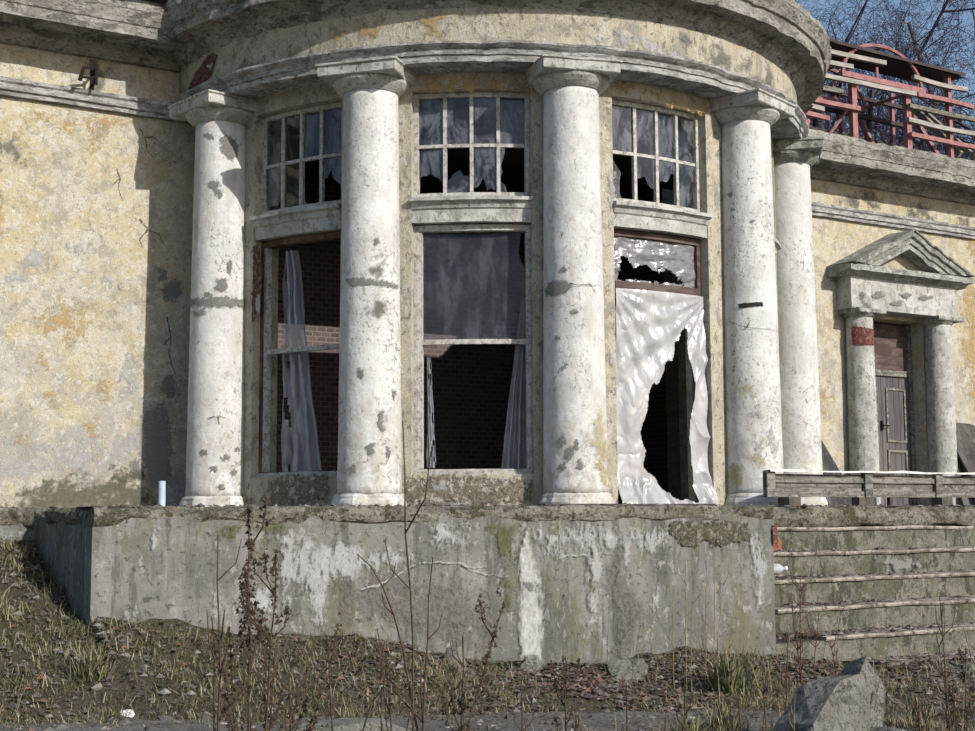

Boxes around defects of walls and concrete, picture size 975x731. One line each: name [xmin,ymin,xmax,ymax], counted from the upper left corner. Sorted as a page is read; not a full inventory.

flaking render [188,53,217,90]
flaking render [157,268,184,303]
flaking render [192,259,233,317]
flaking render [851,326,874,345]
water stain [0,430,156,507]
crack [361,550,506,590]
water stain [502,522,667,660]